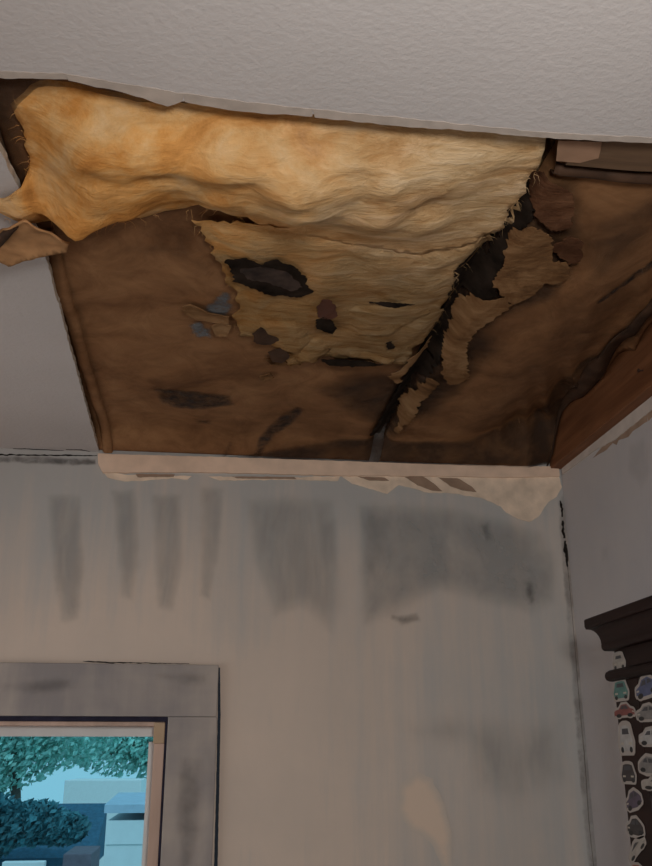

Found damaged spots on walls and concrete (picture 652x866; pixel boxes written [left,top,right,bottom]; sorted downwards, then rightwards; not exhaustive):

water stain [161,390,229,409]
water stain [258,355,579,467]